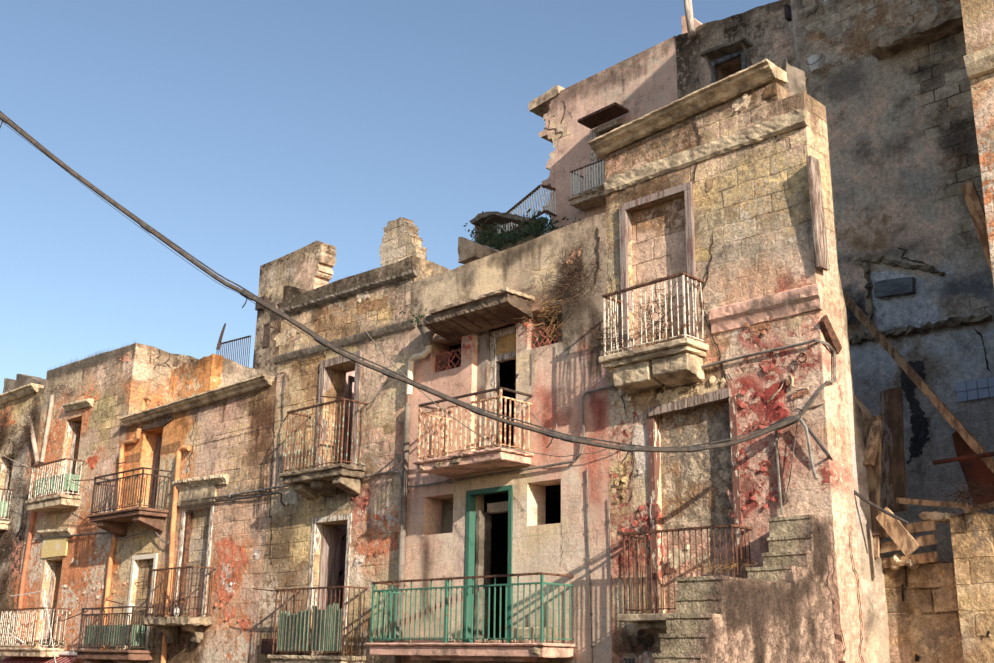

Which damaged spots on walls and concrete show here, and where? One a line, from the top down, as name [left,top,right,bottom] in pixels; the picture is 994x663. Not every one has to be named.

crack [898,248,928,265]
damp [565,312,600,375]
crack [700,232,732,388]
flaking render [655,316,811,404]
flaking render [611,389,649,503]
peeling [729,381,809,433]
damp [11,493,21,537]
peeling [214,537,261,632]
peeling [354,536,399,571]
damp [725,523,830,663]